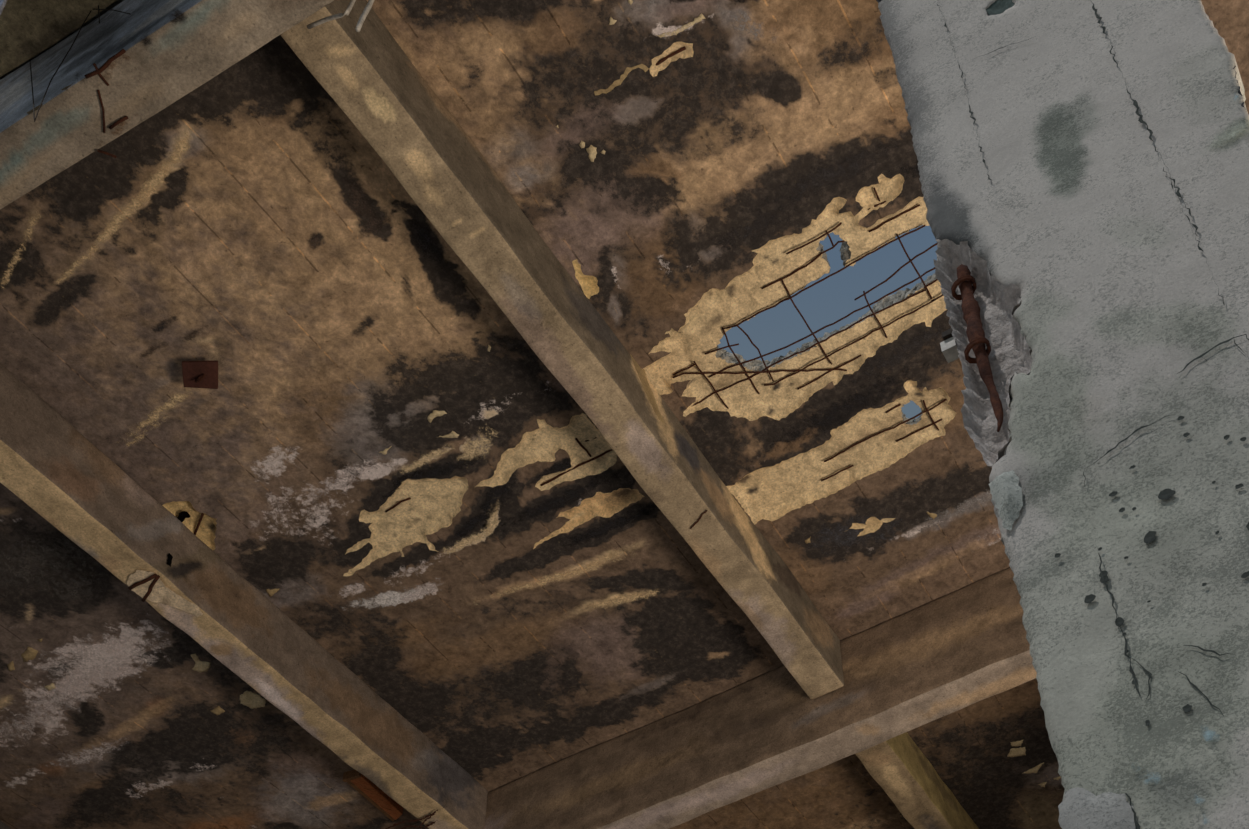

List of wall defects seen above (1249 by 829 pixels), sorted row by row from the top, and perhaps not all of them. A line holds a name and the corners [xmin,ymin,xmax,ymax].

crack [937,4,1034,184]
spalling [643,174,1033,531]
corrosion [951,264,1003,432]
damp [127,394,186,445]
damp [383,432,494,500]
spalling [343,413,617,577]
spalling [533,488,645,549]
crack [1083,415,1171,485]
efflorescence [342,583,434,608]
crack [1095,540,1230,716]
efflorescence [2,634,159,734]
peeling [1007,740,1135,829]